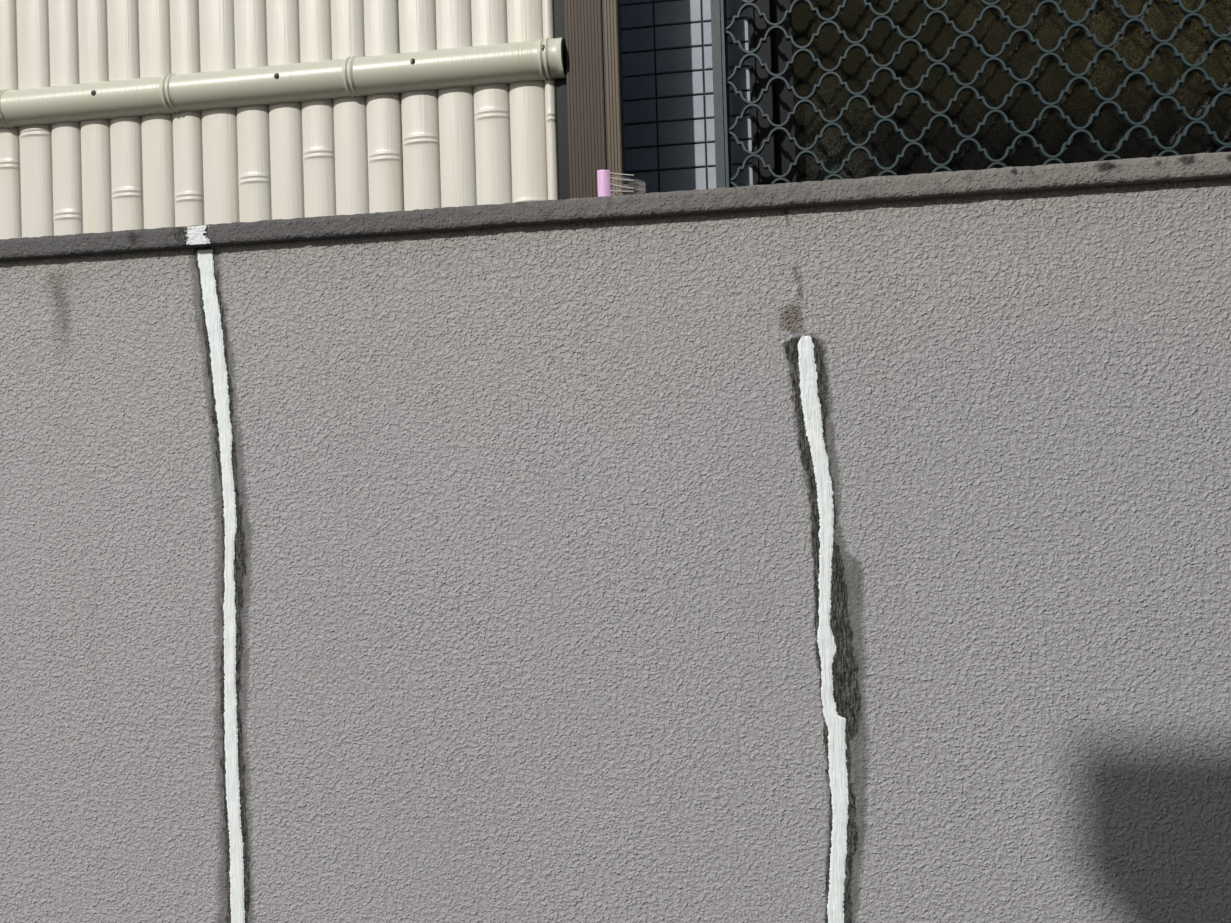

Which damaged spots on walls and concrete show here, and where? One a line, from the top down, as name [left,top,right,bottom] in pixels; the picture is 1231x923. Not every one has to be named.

crack [191,247,252,923]
crack [783,336,866,923]